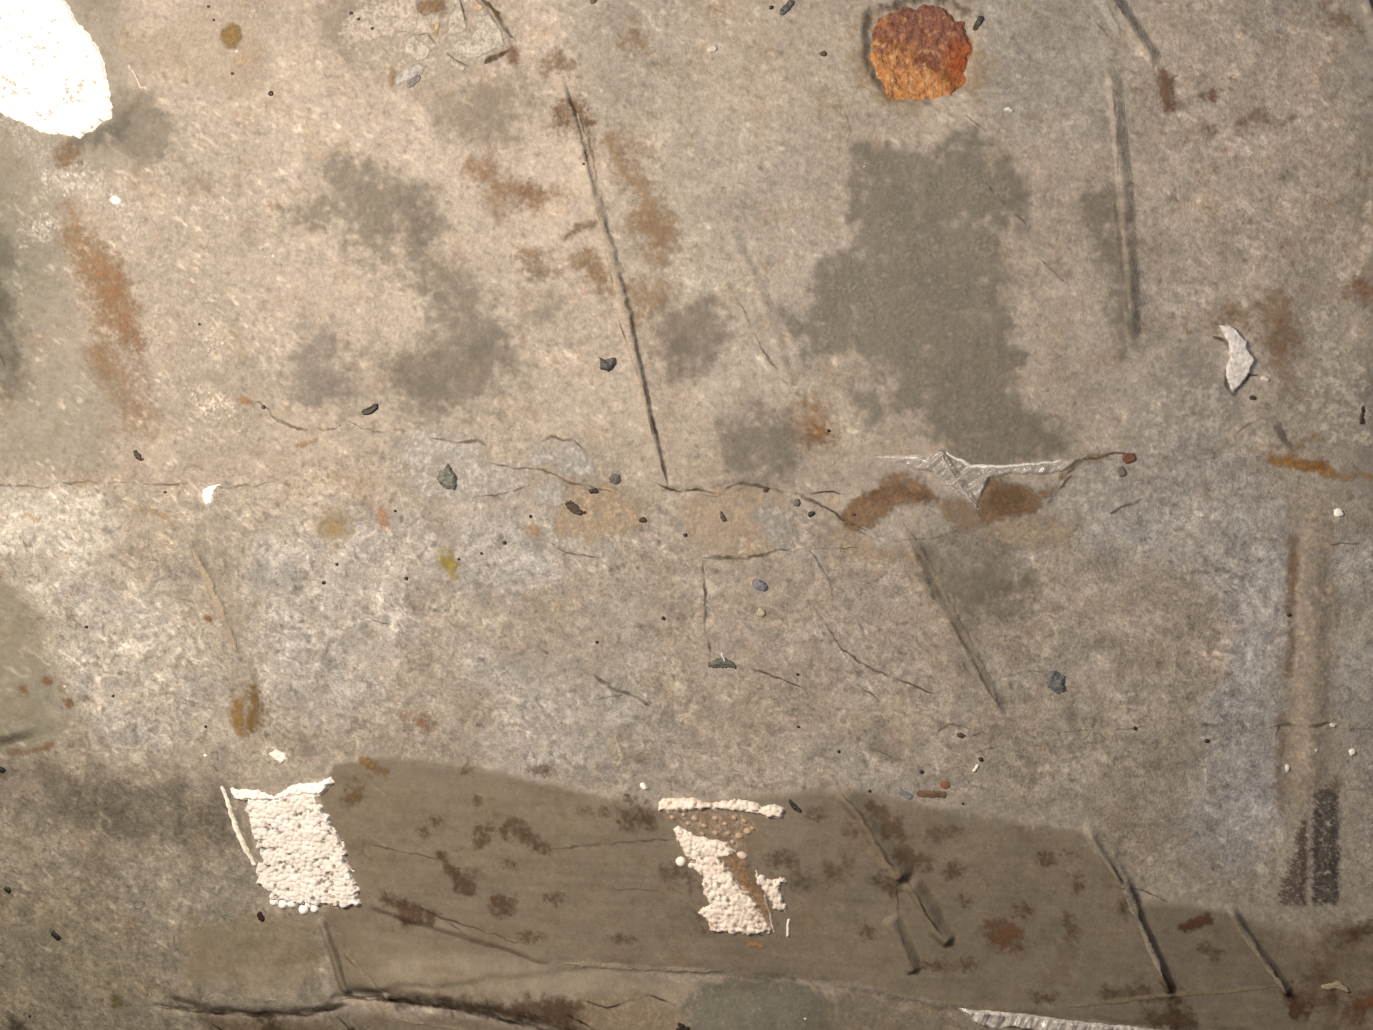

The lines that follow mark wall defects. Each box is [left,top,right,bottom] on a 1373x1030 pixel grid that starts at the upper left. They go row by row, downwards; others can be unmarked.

damp [296,160,419,269]
rust [64,225,141,351]
damp [781,129,1061,473]
damp [390,247,508,449]
crack [635,368,775,497]
crack [809,490,864,549]
rust [842,473,1063,533]
crack [1048,452,1124,503]
rust [436,851,474,895]
peeling [755,870,790,937]
rust [1178,912,1219,960]
crack [177,998,456,1030]